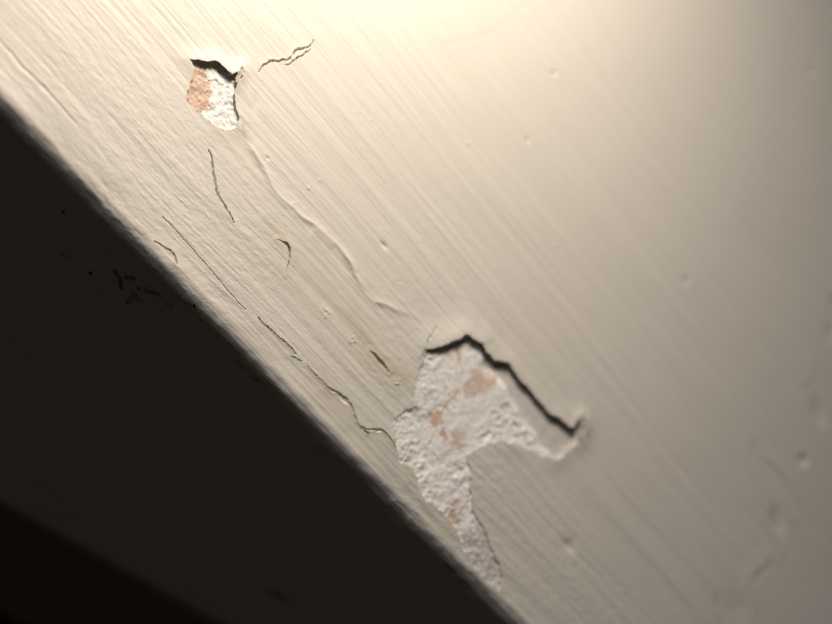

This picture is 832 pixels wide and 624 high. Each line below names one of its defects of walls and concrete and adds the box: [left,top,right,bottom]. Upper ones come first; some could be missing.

peeling [174,38,256,141]
crack [251,32,322,81]
crack [200,142,243,231]
crack [146,208,398,454]
peeling [364,344,395,377]
peeling [381,300,597,603]